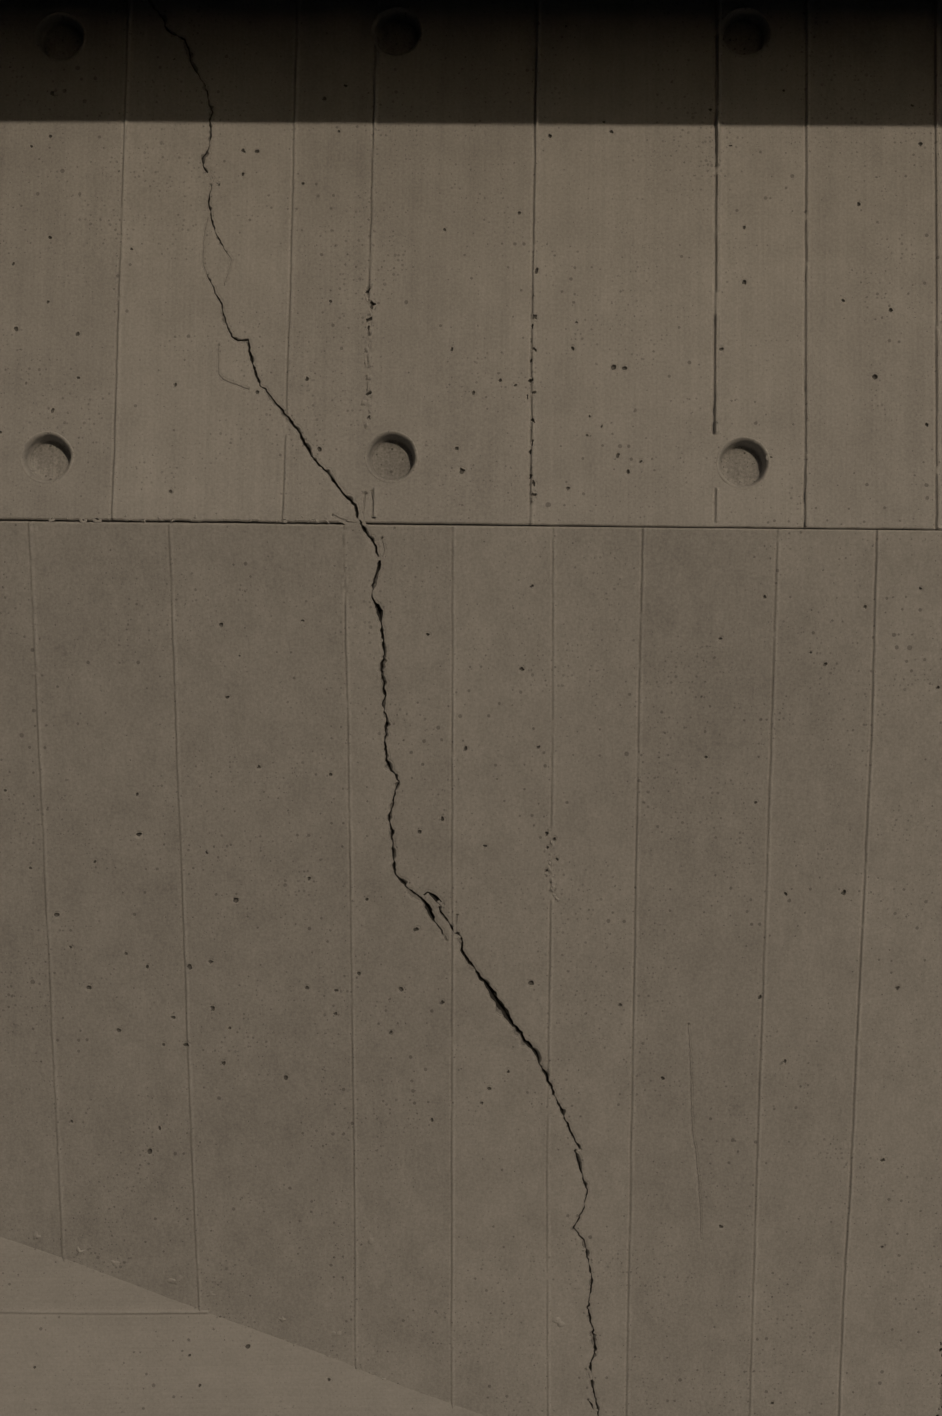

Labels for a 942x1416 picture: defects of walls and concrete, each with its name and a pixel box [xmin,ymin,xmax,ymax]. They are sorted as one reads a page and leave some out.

crack [147,0,601,1416]